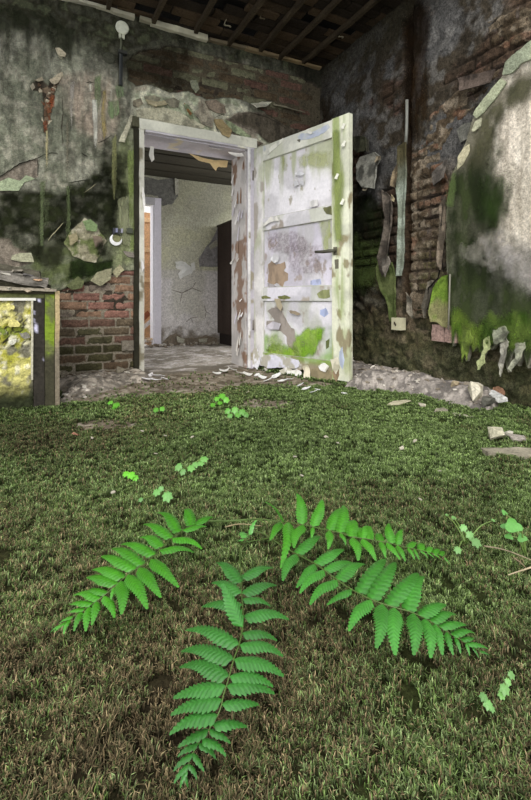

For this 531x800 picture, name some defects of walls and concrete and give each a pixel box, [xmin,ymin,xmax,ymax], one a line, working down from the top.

flaking render [0,175,34,191]
crack [1,100,67,176]
damp [0,150,134,280]
peeling [189,152,244,170]
flaking render [119,47,330,155]
peeling [230,175,243,276]
peeling [310,198,344,215]
flaking render [341,7,531,377]
flaking render [59,218,145,378]
peeling [251,253,344,382]